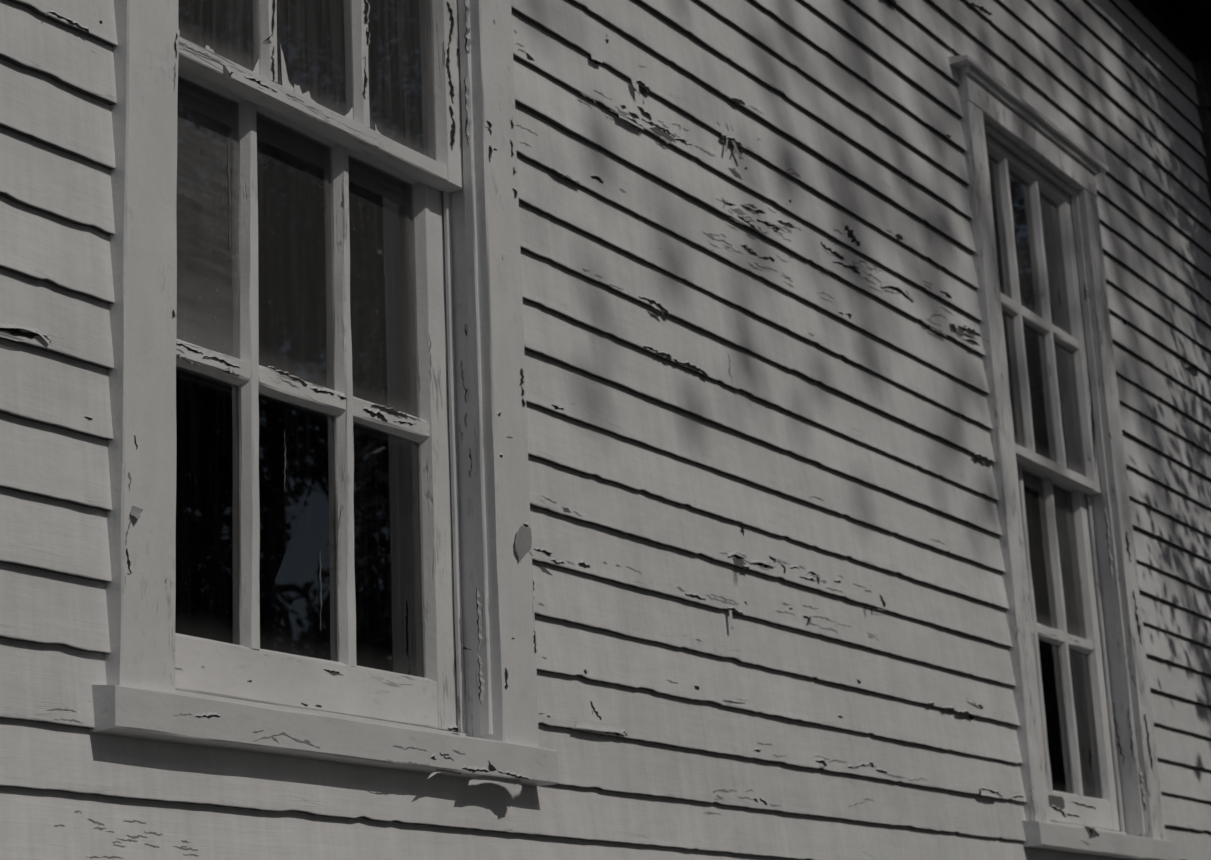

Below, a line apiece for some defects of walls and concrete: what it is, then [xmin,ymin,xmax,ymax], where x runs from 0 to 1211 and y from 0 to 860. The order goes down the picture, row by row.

peeling [174,33,233,91]
peeling [247,0,304,102]
peeling [581,65,715,157]
peeling [552,166,604,186]
peeling [0,322,52,345]
peeling [176,341,240,375]
peeling [268,366,347,400]
peeling [923,281,990,350]
peeling [363,404,420,425]
peeling [515,522,641,606]
peeling [678,587,748,629]
peeling [720,549,886,610]